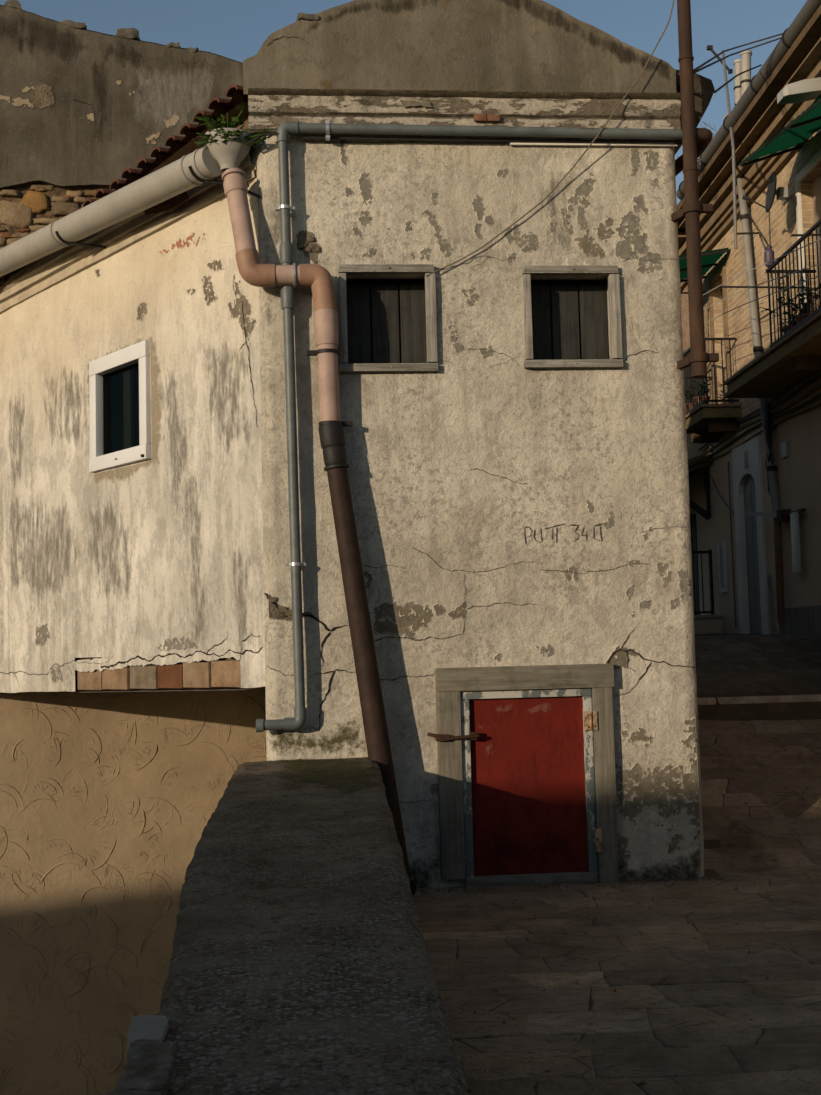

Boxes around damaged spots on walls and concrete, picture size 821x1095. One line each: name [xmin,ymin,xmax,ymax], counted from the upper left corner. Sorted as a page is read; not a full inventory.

water stain [610,42,669,77]
peeling [503,223,539,264]
peeling [548,172,662,274]
water stain [209,354,248,447]
water stain [11,502,70,589]
water stain [90,504,130,595]
spalling [51,636,241,690]
crack [0,593,434,731]
peeling [372,601,467,641]
crack [363,547,651,641]
crack [608,625,701,697]
peeling [615,717,701,869]